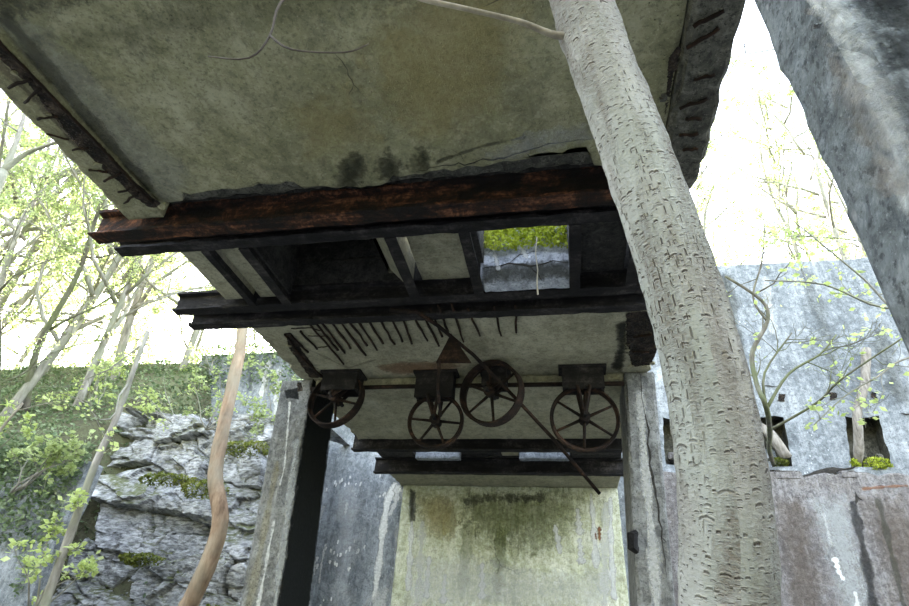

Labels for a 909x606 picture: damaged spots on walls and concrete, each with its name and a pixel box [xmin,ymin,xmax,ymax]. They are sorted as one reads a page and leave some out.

spalling [659,9,725,114]
spalling [0,40,168,210]
spalling [284,303,464,400]
damp [468,493,617,600]